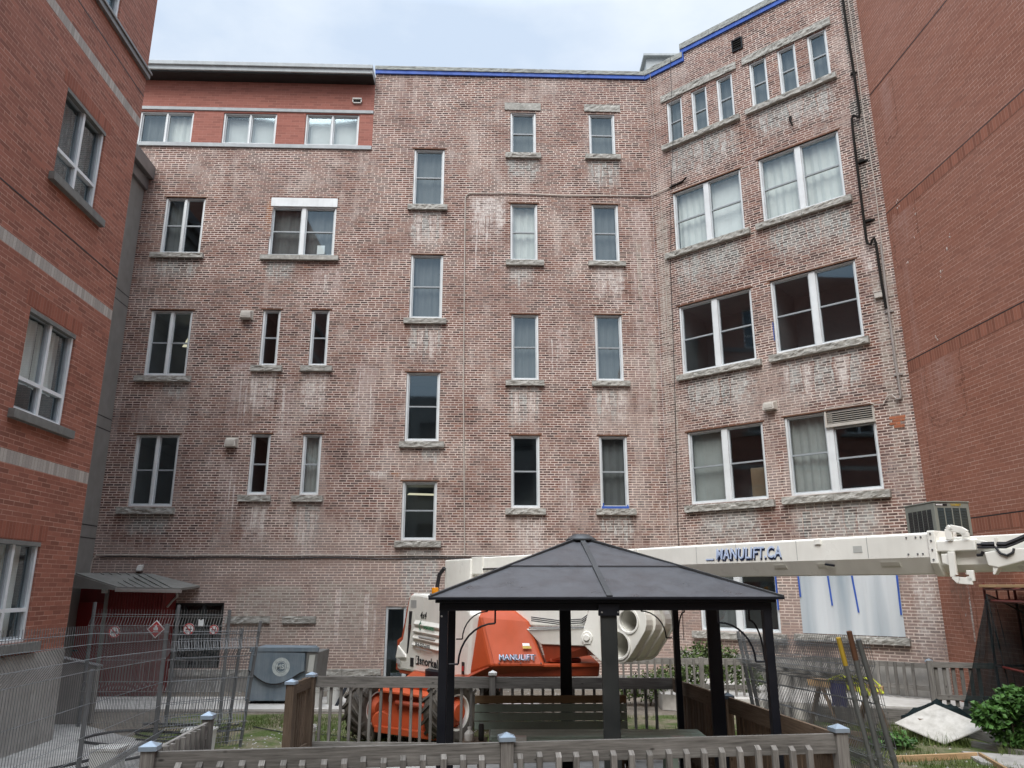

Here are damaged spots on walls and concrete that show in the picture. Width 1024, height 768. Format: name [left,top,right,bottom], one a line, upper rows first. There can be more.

leakage [407,210,447,253]
leakage [468,158,543,295]
leakage [585,160,622,195]
leakage [663,0,968,540]